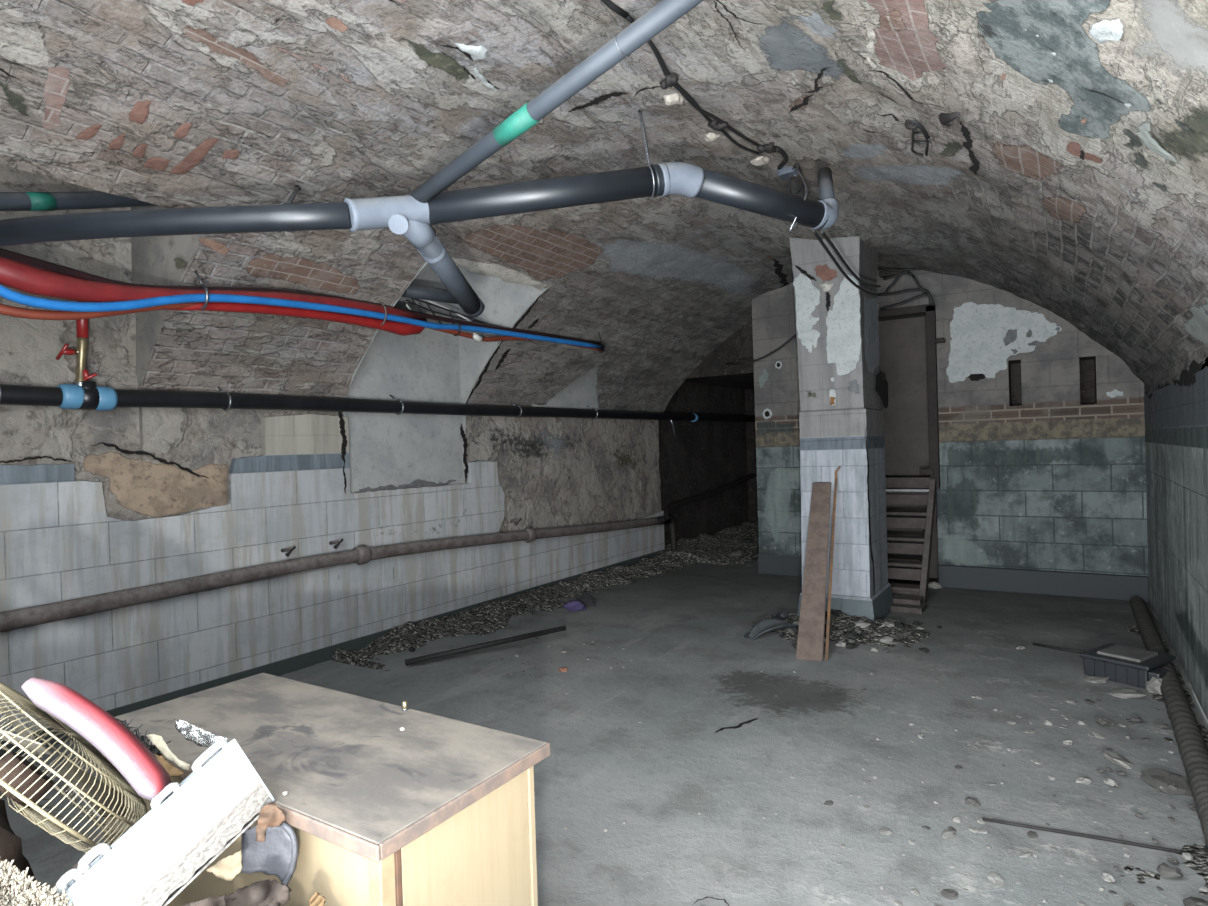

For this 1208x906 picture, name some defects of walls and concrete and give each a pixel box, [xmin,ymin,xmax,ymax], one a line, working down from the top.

flaking render [866,0,948,81]
crack [790,67,832,112]
flaking render [977,0,1177,181]
peeling [793,264,888,408]
peeling [946,302,1062,383]
crack [338,291,546,494]
crack [0,442,208,478]
flaking render [83,452,229,518]
water stain [944,447,1115,527]